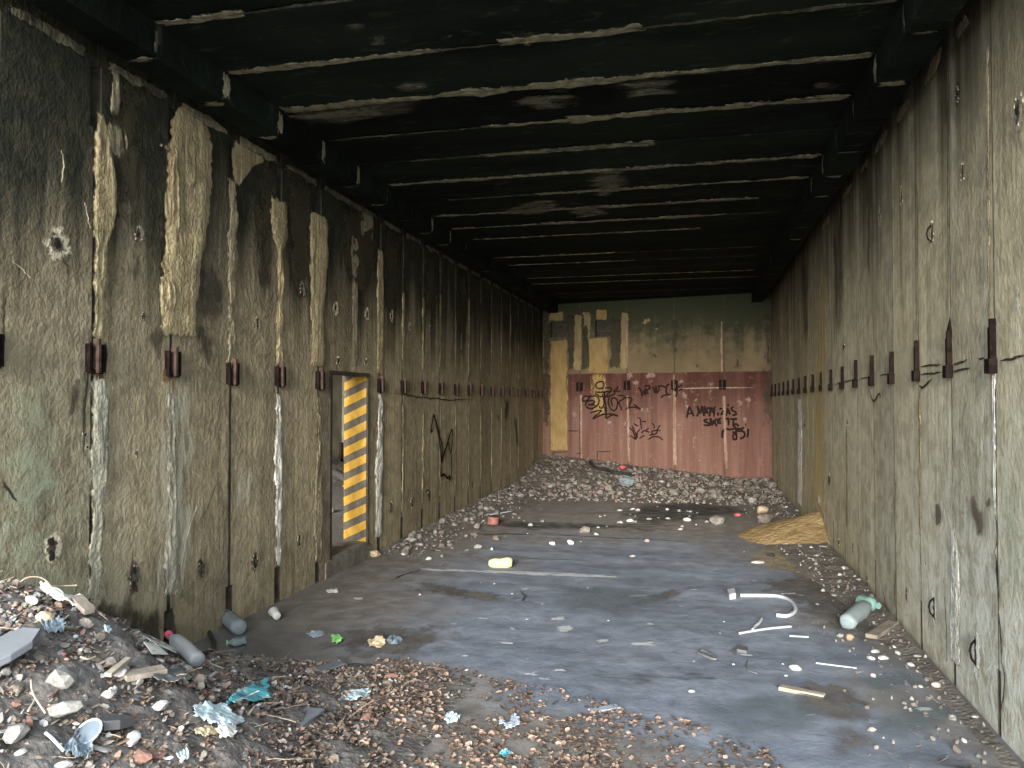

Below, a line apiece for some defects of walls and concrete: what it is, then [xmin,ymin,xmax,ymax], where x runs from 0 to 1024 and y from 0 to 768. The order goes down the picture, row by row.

spalling [44,227,72,261]
peeling [161,145,197,232]
spalling [43,530,62,564]
water stain [71,376,176,644]
water stain [153,379,193,598]
water stain [274,394,283,565]